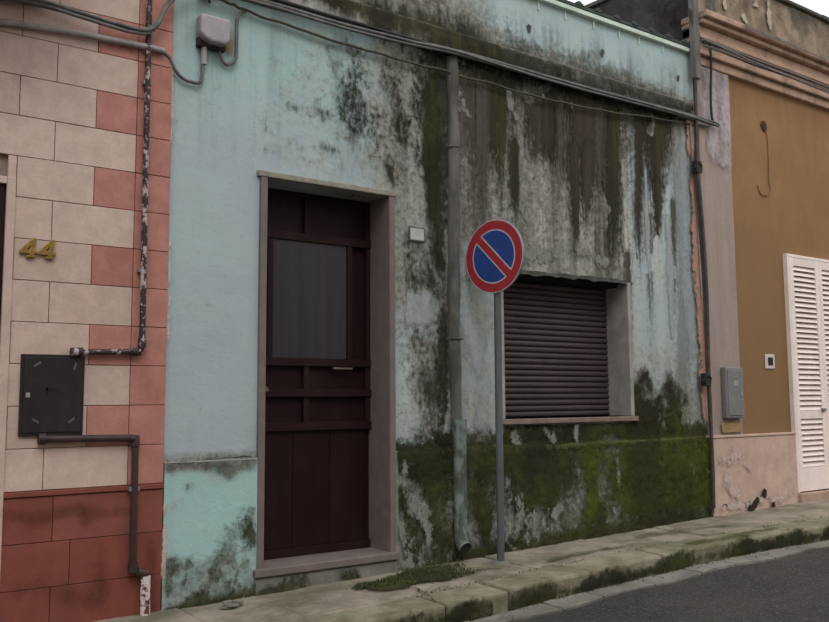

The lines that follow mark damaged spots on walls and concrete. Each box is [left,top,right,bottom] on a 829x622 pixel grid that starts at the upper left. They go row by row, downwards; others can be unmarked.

damp [337,39,382,148]
damp [383,43,694,447]
flaking render [722,488,799,512]
damp [165,557,194,596]
damp [170,508,257,609]